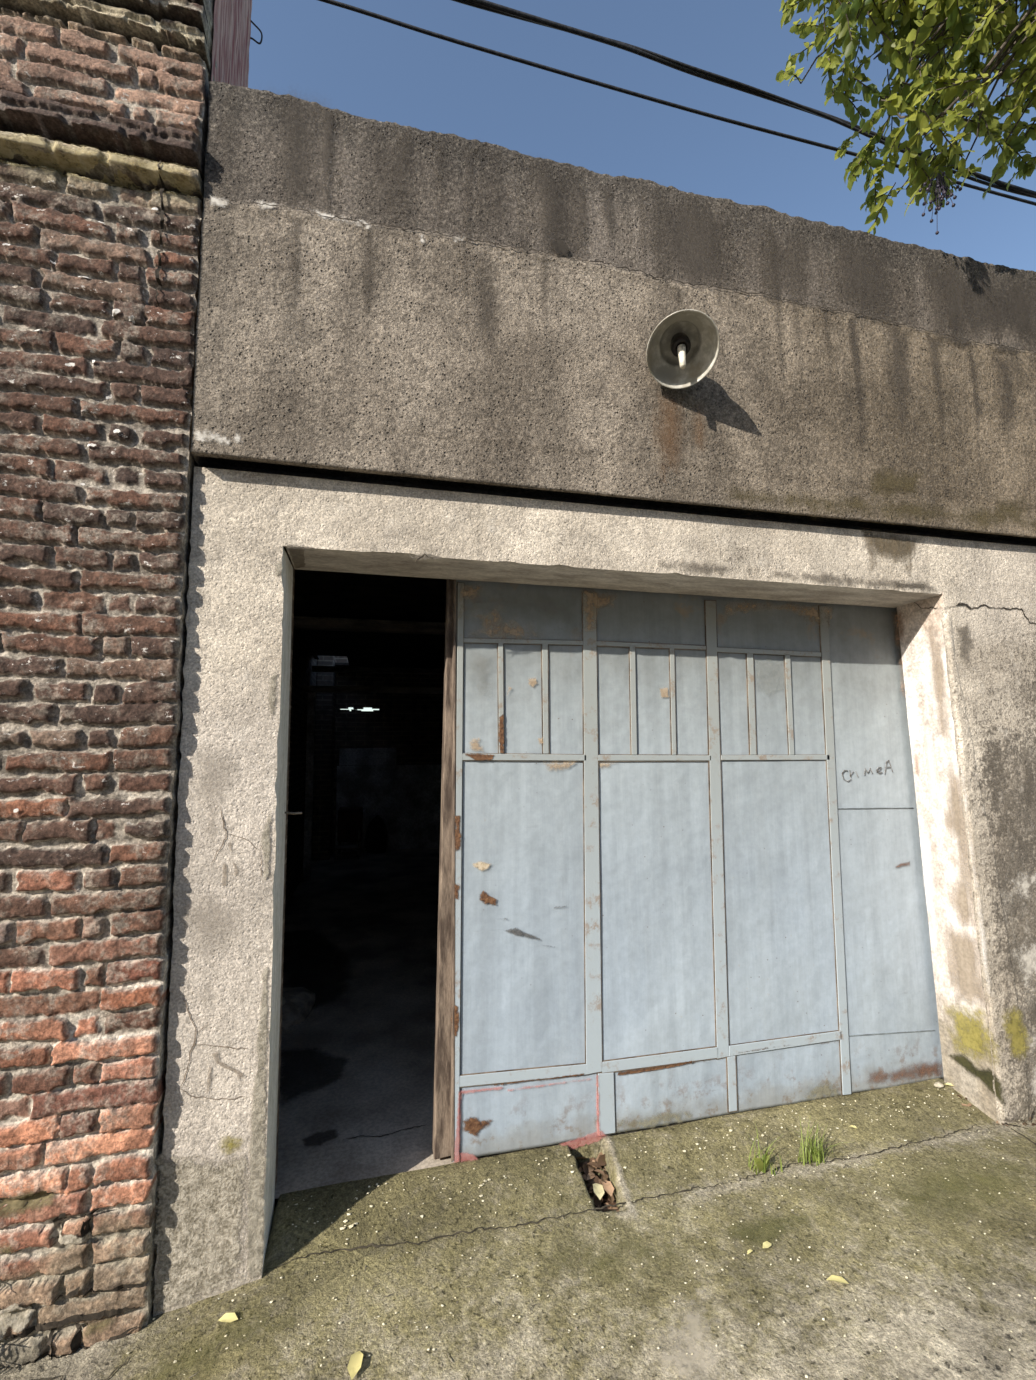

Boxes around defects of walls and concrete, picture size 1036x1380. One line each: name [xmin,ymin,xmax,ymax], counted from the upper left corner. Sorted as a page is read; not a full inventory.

crack [155,161,168,306]
crack [916,603,1036,624]
water stain [958,626,973,658]
rust [465,715,504,760]
water stain [923,826,937,947]
water stain [1017,875,1036,896]
water stain [1020,944,1036,985]
rust [618,1061,695,1075]
rust [872,1064,937,1082]
rust [463,1117,491,1136]
crack [271,1106,1036,1269]
crack [3,1284,139,1380]